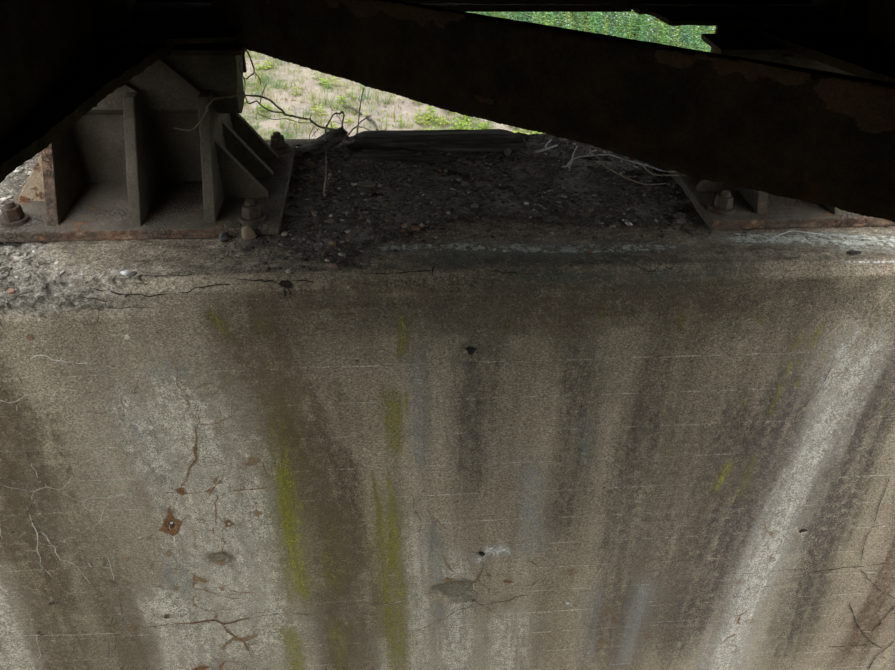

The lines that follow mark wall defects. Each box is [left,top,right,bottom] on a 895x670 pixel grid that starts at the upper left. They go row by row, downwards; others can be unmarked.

rust [813,77,895,134]
rust [159,508,192,556]
crack [0,342,433,670]
leakage [0,311,531,670]
crack [397,568,565,645]
crack [732,477,894,670]